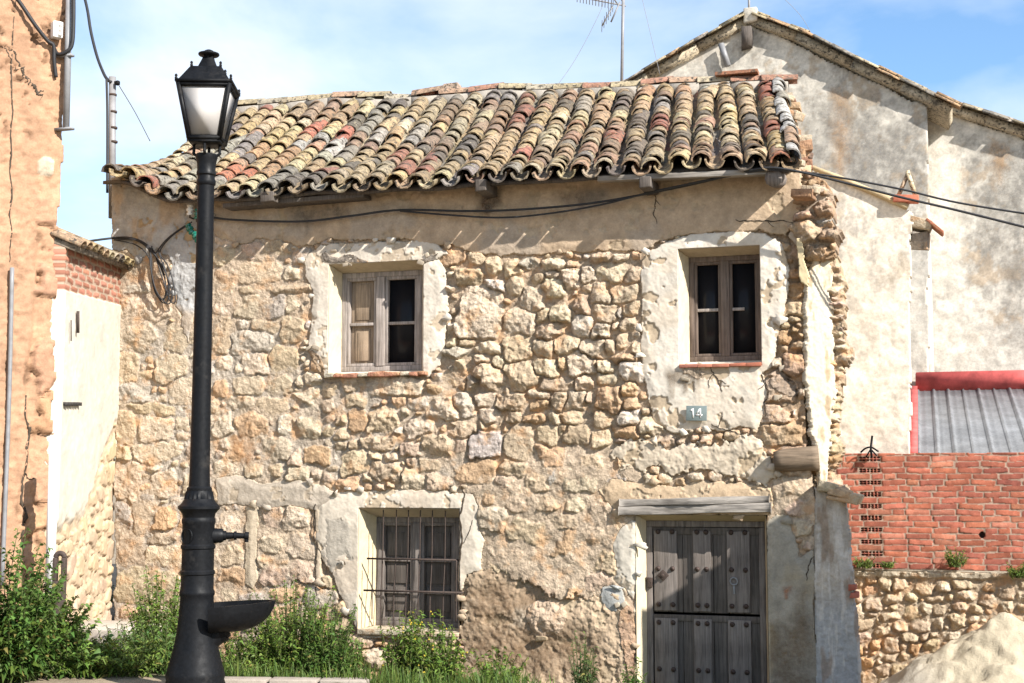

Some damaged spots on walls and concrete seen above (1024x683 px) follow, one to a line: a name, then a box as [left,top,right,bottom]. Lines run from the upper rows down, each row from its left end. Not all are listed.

crack [2,1,44,262]
peeling [214,169,862,683]